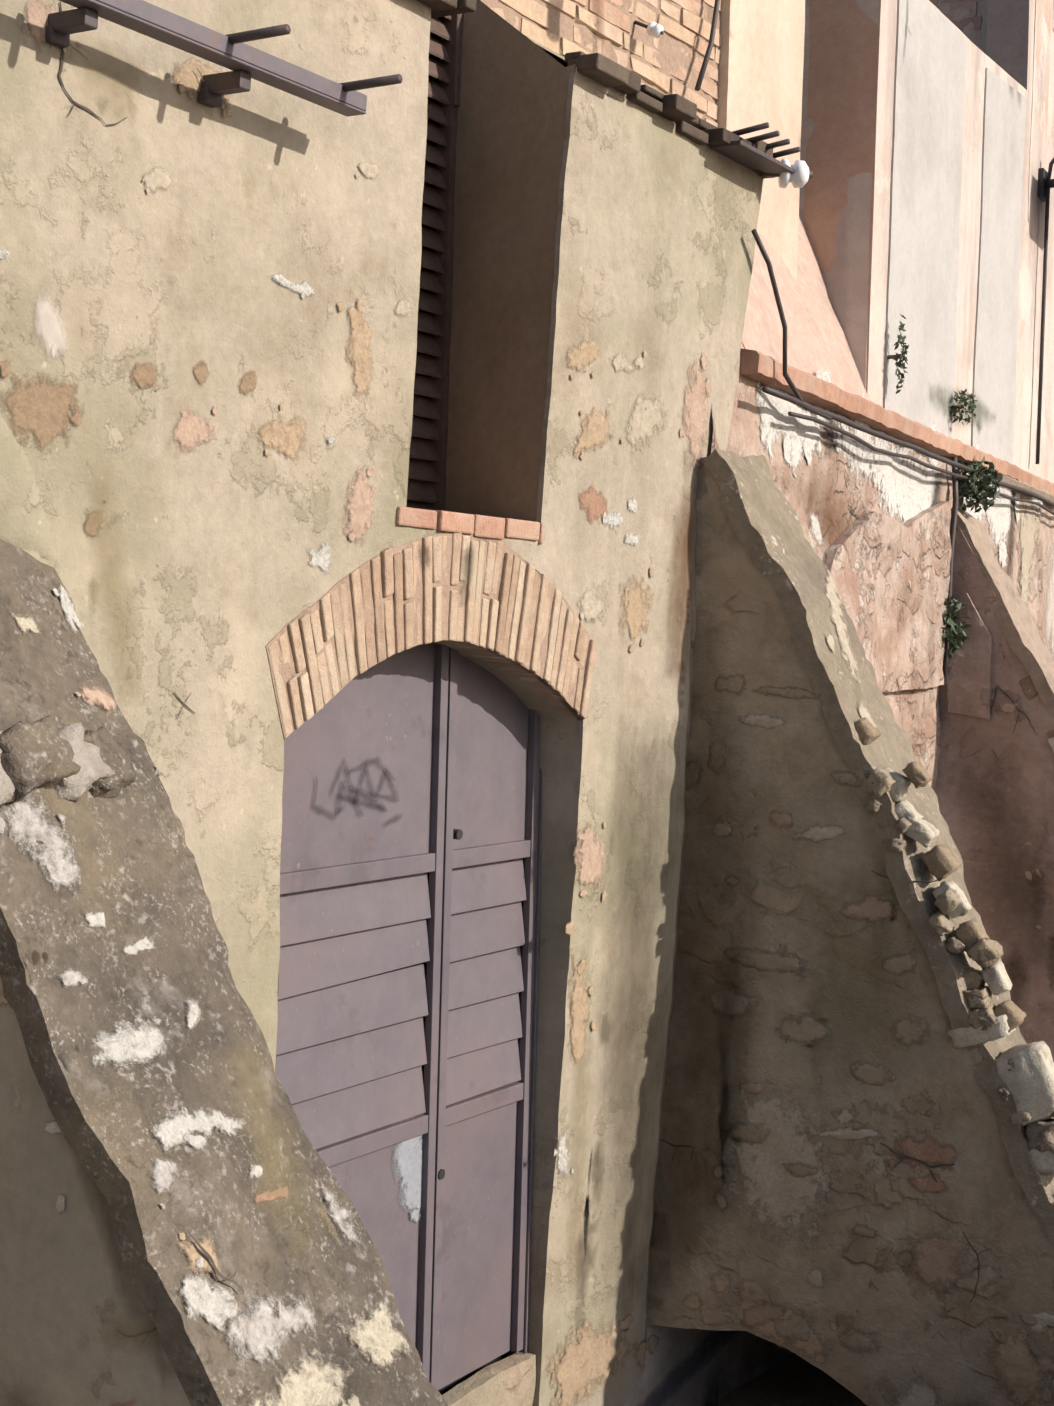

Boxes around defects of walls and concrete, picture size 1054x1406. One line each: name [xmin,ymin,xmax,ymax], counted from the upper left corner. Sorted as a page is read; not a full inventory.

flaking render [173,59,222,99]
spalling [338,299,373,395]
spalling [0,359,83,448]
spalling [574,353,712,467]
spalling [578,590,604,622]
spalling [619,567,654,653]
flaking render [547,1315,659,1406]